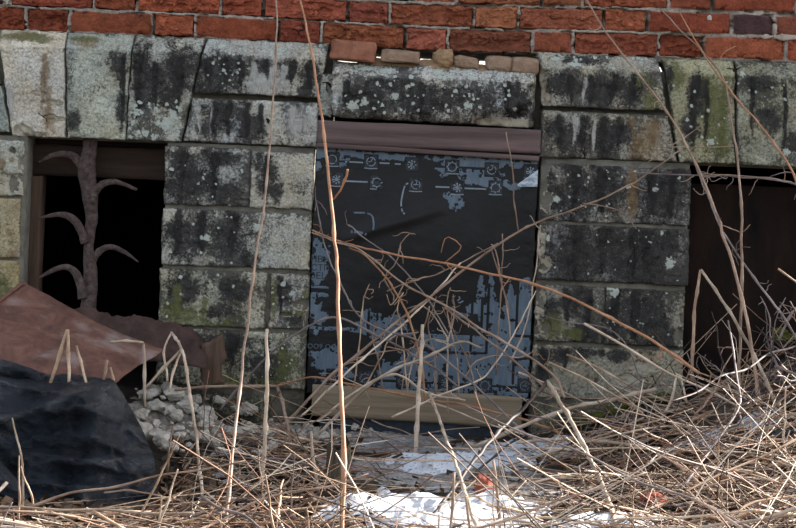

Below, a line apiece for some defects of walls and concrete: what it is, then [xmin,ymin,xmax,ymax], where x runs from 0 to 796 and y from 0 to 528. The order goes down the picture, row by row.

spalling [0,0,701,58]
water stain [67,107,81,130]
water stain [339,77,534,120]
water stain [678,65,729,151]
water stain [743,74,796,156]
water stain [107,36,323,327]
water stain [532,54,691,387]
water stain [199,329,286,385]